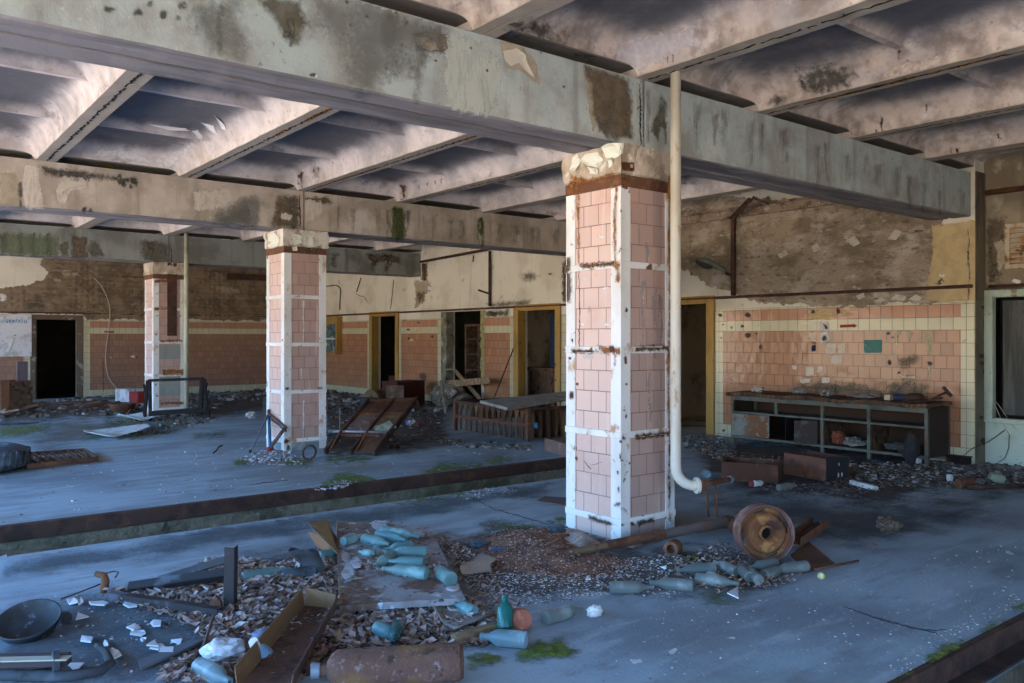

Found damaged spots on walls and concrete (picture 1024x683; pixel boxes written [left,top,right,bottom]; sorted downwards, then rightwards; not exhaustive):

damp [262,0,306,46]
peeling [499,42,540,84]
damp [574,26,702,143]
peeling [569,143,624,174]
damp [0,164,137,211]
damp [271,195,300,229]
damp [0,232,104,259]
flaking render [0,258,145,321]
flaking render [189,266,266,322]
flaking render [681,196,945,351]
corrosion [569,162,671,501]
crack [844,606,947,634]